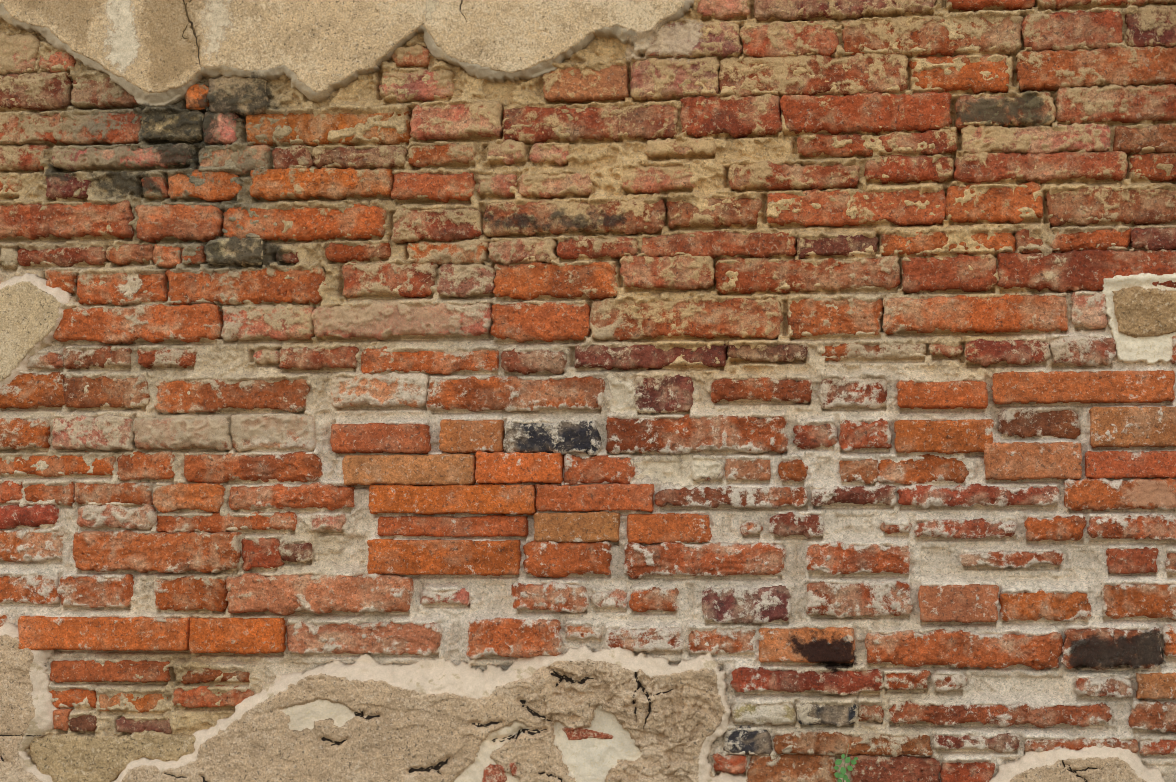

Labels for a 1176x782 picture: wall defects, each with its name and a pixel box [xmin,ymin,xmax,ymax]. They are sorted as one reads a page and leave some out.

crack [182,0,202,68]
flaking render [0,0,695,107]
flaking render [0,273,72,394]
crack [321,711,380,746]
flaking render [0,622,748,782]
crack [472,700,551,742]
crack [551,671,594,687]
crack [633,672,673,727]
crack [408,759,448,774]
flaking render [989,746,1166,782]